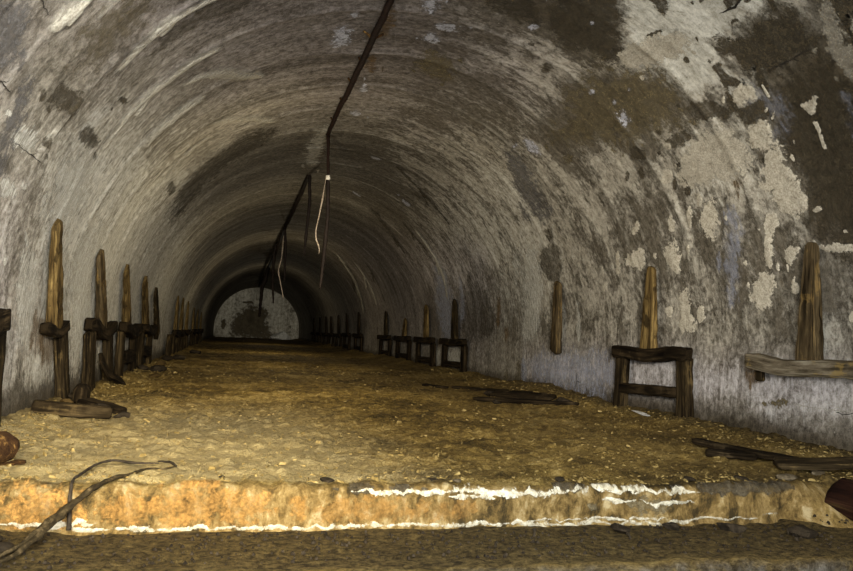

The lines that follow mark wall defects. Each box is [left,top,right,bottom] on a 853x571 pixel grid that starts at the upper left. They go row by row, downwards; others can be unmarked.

damp [0,0,84,199]
damp [40,126,101,239]
peeling [617,29,698,81]
spalling [649,0,669,16]
crack [721,0,748,13]
peeling [656,0,827,312]
damp [762,57,853,268]
damp [13,232,40,352]
damp [64,213,106,371]
peeling [615,213,690,276]
peeling [665,287,706,336]
peeling [812,240,853,253]